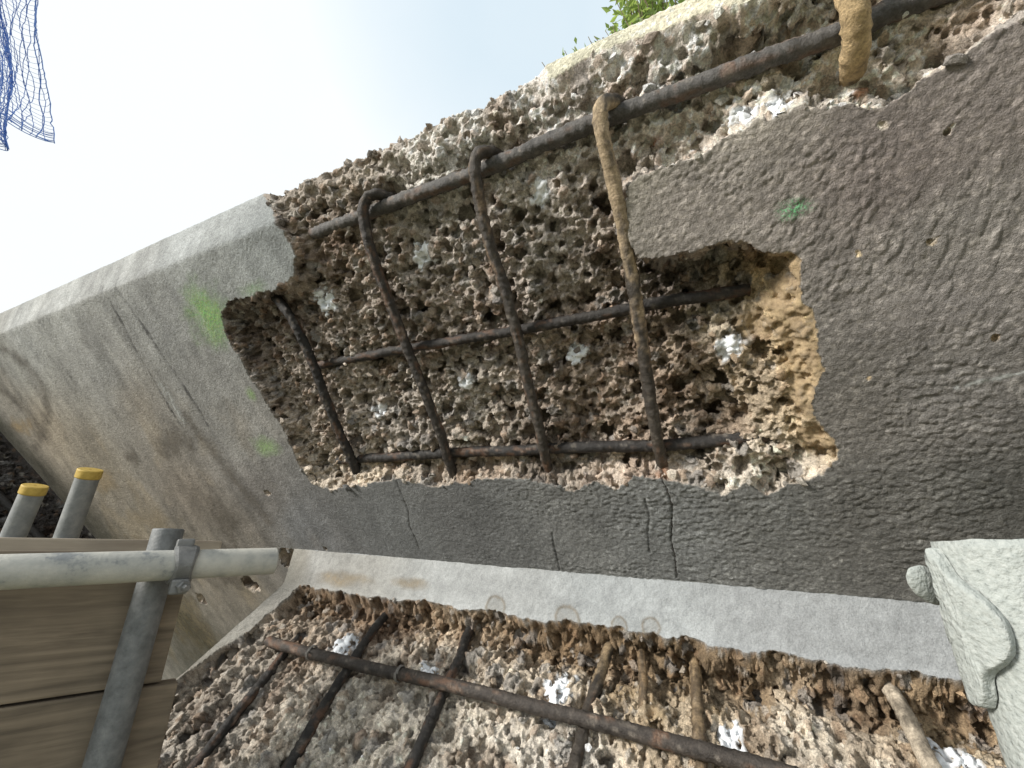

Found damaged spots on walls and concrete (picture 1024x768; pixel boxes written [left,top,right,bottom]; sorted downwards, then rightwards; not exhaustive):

spalling [609,0,1024,225]
spalling [221,0,839,497]
rust [733,261,836,454]
crack [660,475,678,578]
spalling [157,585,1007,768]
rust [611,684,634,708]
rust [921,723,959,751]